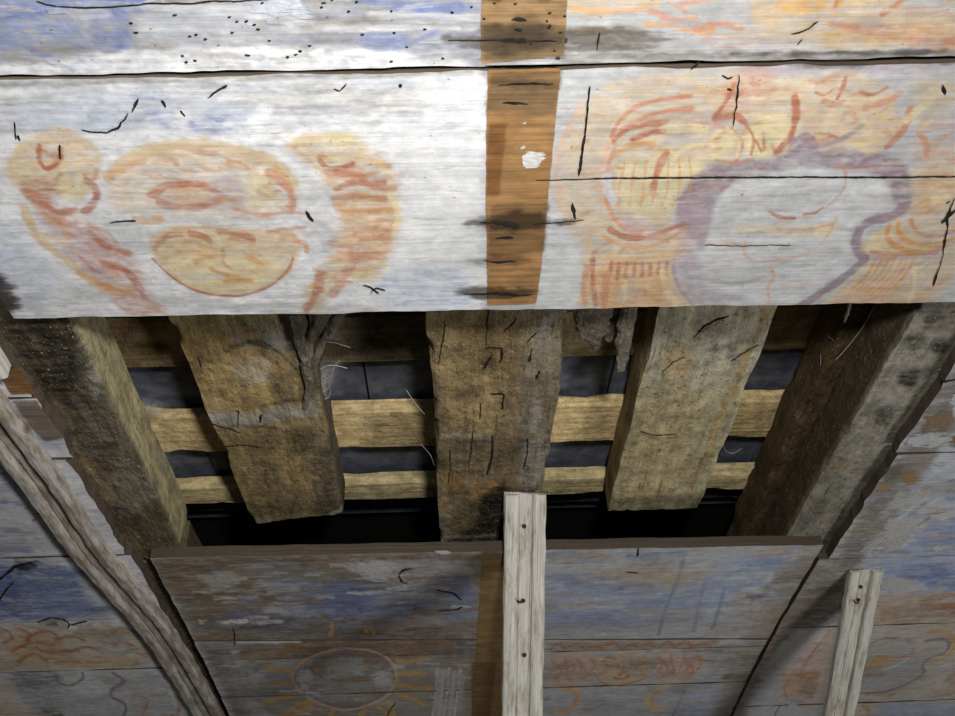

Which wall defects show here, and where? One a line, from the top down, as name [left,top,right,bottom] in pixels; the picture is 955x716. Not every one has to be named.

crack [82,98,185,133]
peeling [488,125,505,194]
peeling [521,146,546,168]
crack [556,86,955,286]
peeling [489,204,548,255]
crack [480,203,580,264]
crack [0,562,33,600]